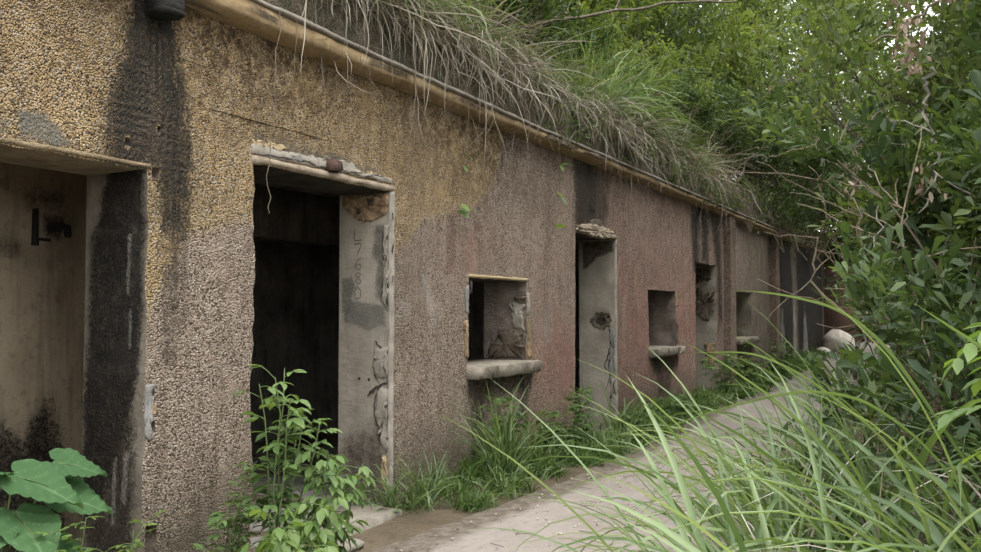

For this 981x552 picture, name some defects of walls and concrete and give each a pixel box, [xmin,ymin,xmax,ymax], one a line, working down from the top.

spalling [251,139,389,178]
damp [81,0,191,552]
spalling [342,193,389,312]
spalling [488,293,535,360]
spalling [590,311,612,330]
damp [0,398,63,473]
flaking render [358,347,389,491]
damp [0,488,65,528]